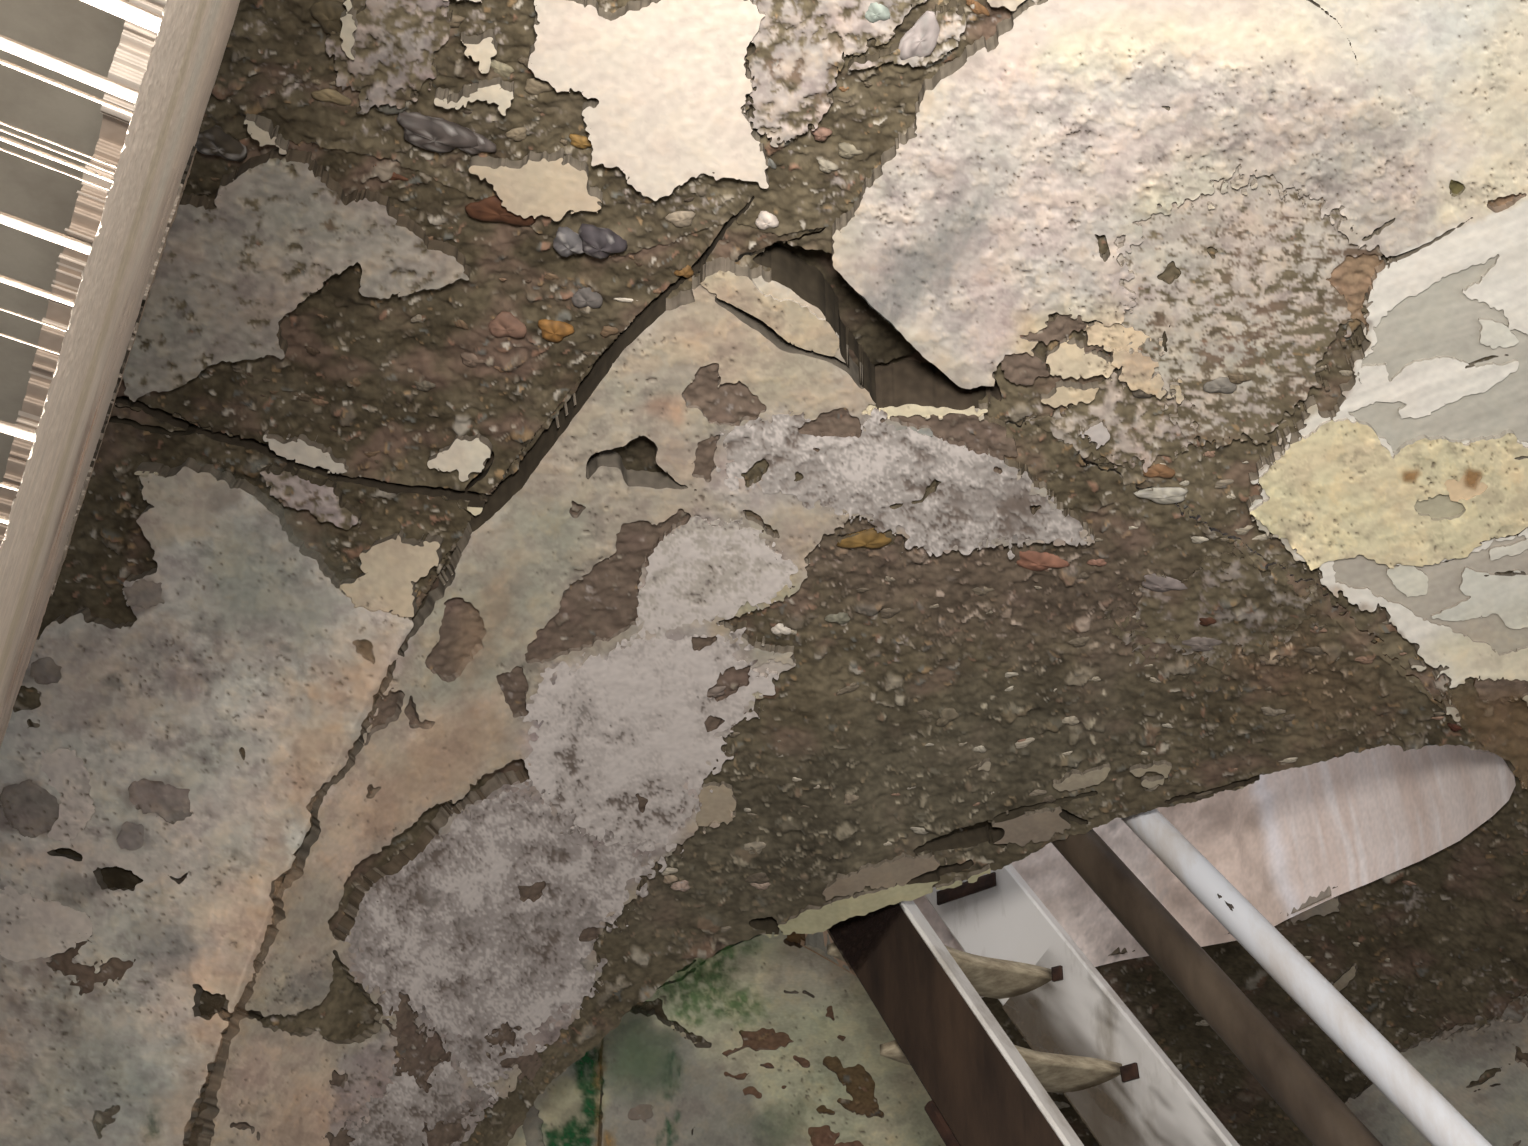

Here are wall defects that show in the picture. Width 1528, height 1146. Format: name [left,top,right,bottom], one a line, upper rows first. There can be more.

flaking render [0,185,108,545]
crack [65,196,1002,544]
spalling [37,0,1048,682]
crack [47,848,83,861]
spalling [46,933,136,996]
spalling [93,866,143,891]
crack [182,564,456,1146]
spalling [258,759,530,1093]
leakage [343,516,798,1146]
spalling [421,163,1528,1146]
crack [906,791,1098,885]
crack [1164,775,1260,804]